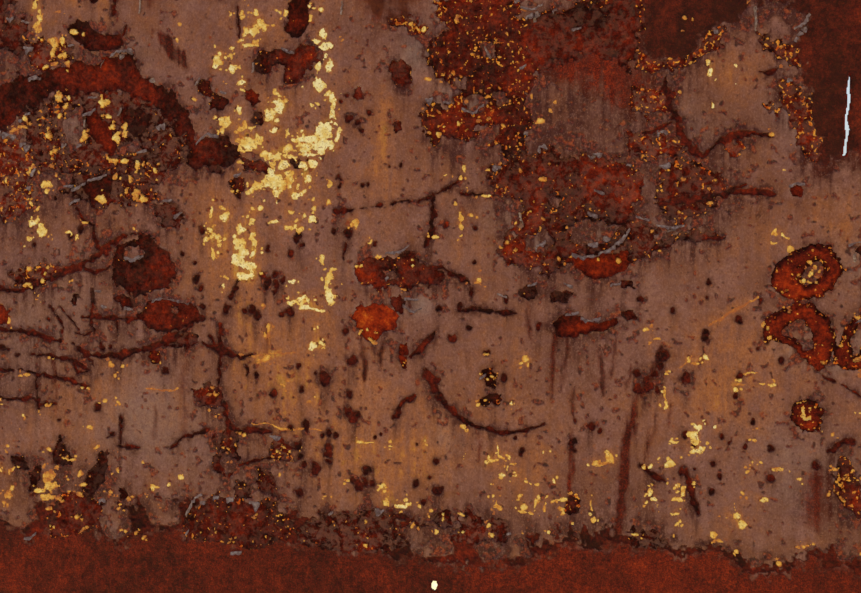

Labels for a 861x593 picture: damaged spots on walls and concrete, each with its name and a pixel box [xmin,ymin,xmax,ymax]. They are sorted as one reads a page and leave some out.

corrosion [151,27,193,74]
peeling [755,31,825,163]
crack [0,206,141,293]
peeling [70,227,206,374]
peeling [0,0,371,339]
peeling [342,237,446,345]
crack [333,180,516,317]
peeling [387,0,727,410]
corrosion [763,243,861,371]
crack [0,302,295,466]
crack [391,331,545,436]
corrosion [0,331,861,593]